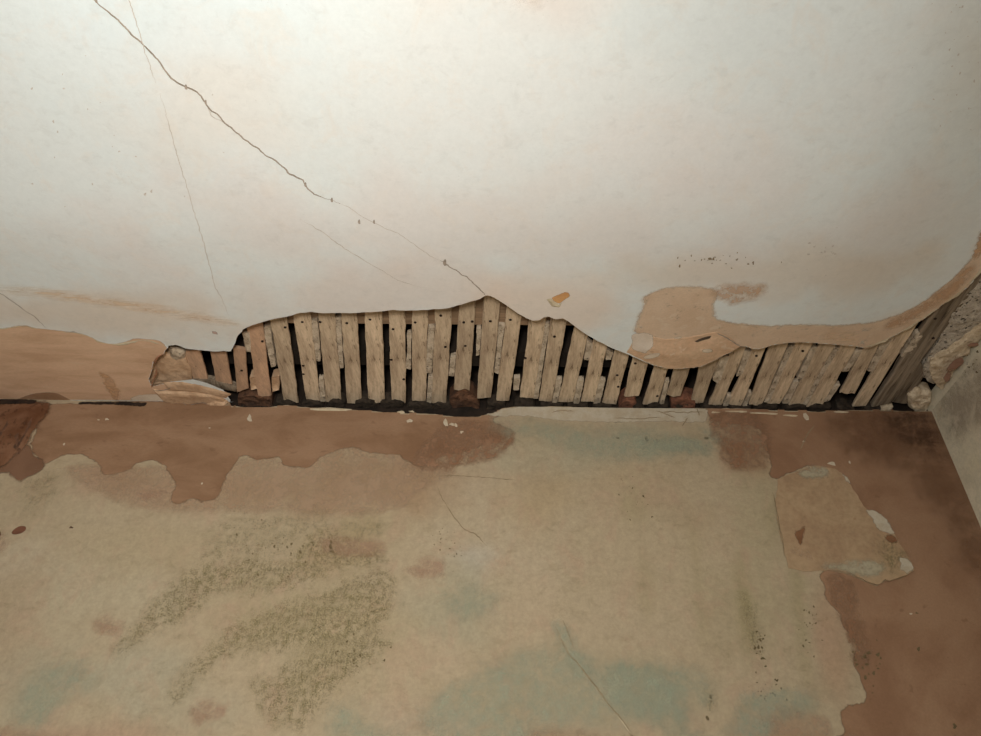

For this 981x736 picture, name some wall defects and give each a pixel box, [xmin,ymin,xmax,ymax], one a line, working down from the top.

crack [94,0,485,316]
peeling [0,233,981,736]
damp [191,573,394,723]